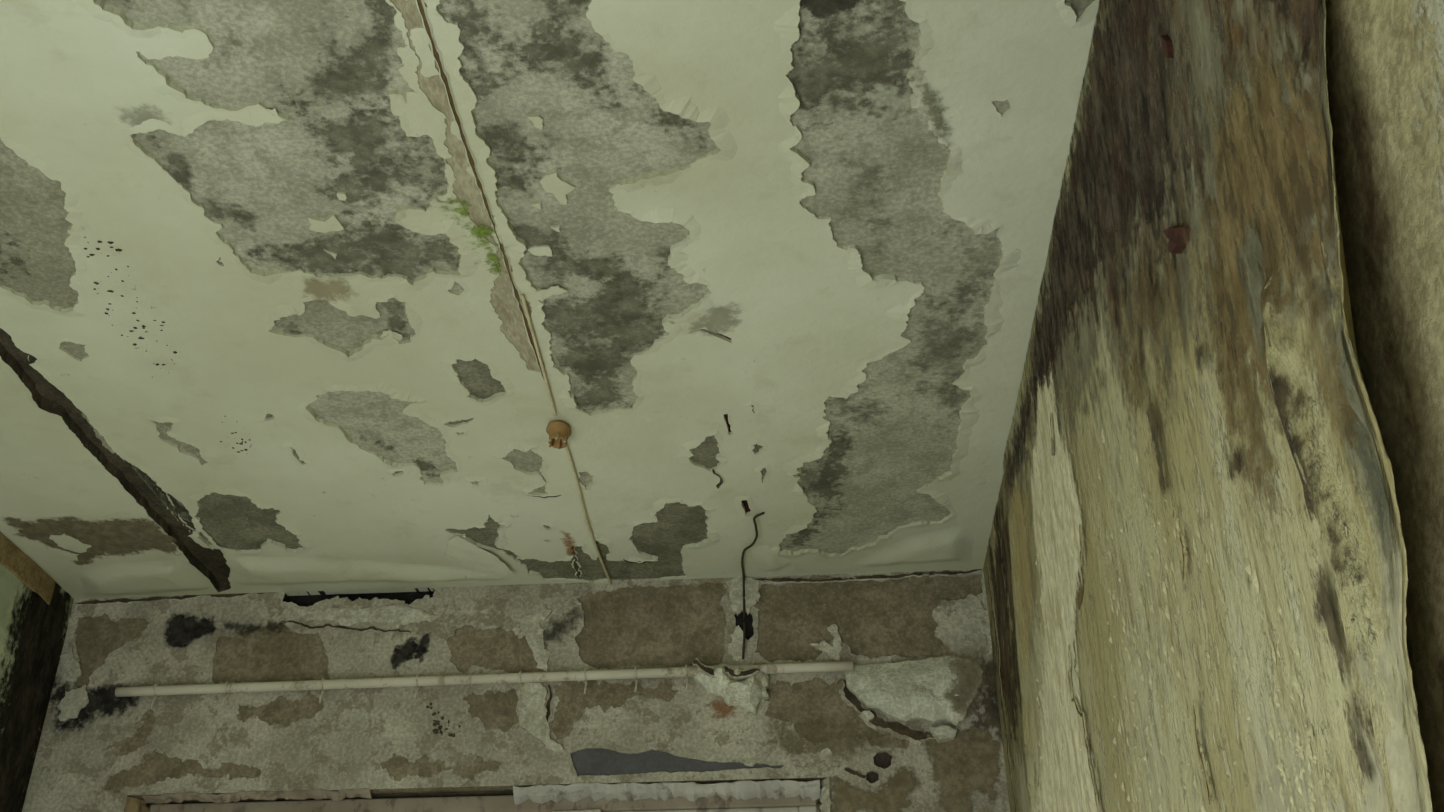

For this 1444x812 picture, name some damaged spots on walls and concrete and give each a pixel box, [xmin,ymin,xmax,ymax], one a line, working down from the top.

peeling [0,129,88,317]
peeling [77,0,738,418]
peeling [298,354,515,488]
peeling [426,0,1021,786]
leakage [831,0,1398,812]
crack [123,459,213,550]
peeling [188,485,313,556]
peeling [57,610,155,722]
peeling [210,587,439,730]
peeling [102,706,264,795]
peeling [373,751,511,784]
leakage [775,721,881,759]